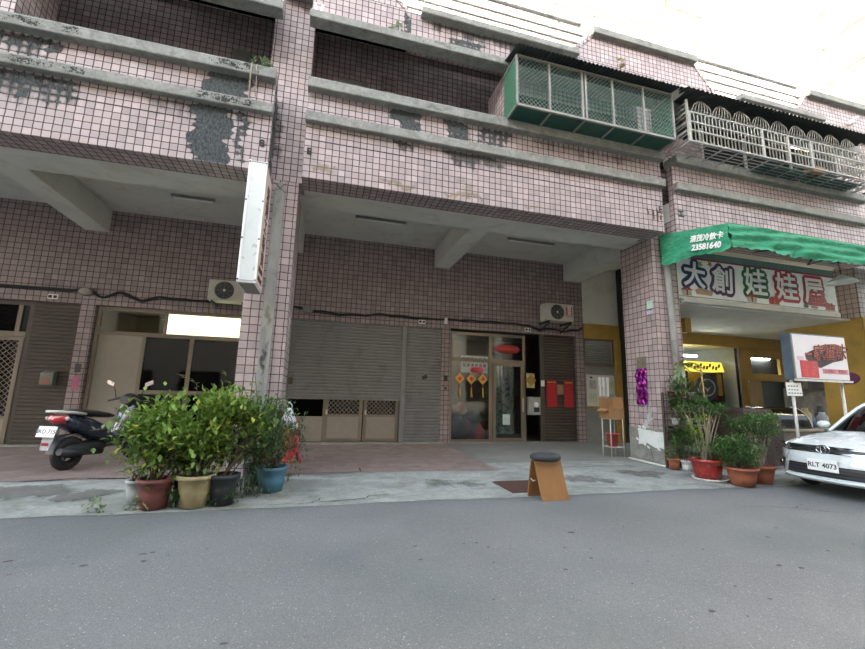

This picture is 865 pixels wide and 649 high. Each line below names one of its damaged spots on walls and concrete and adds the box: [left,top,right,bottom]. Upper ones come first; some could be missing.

peeling [636,425,664,451]